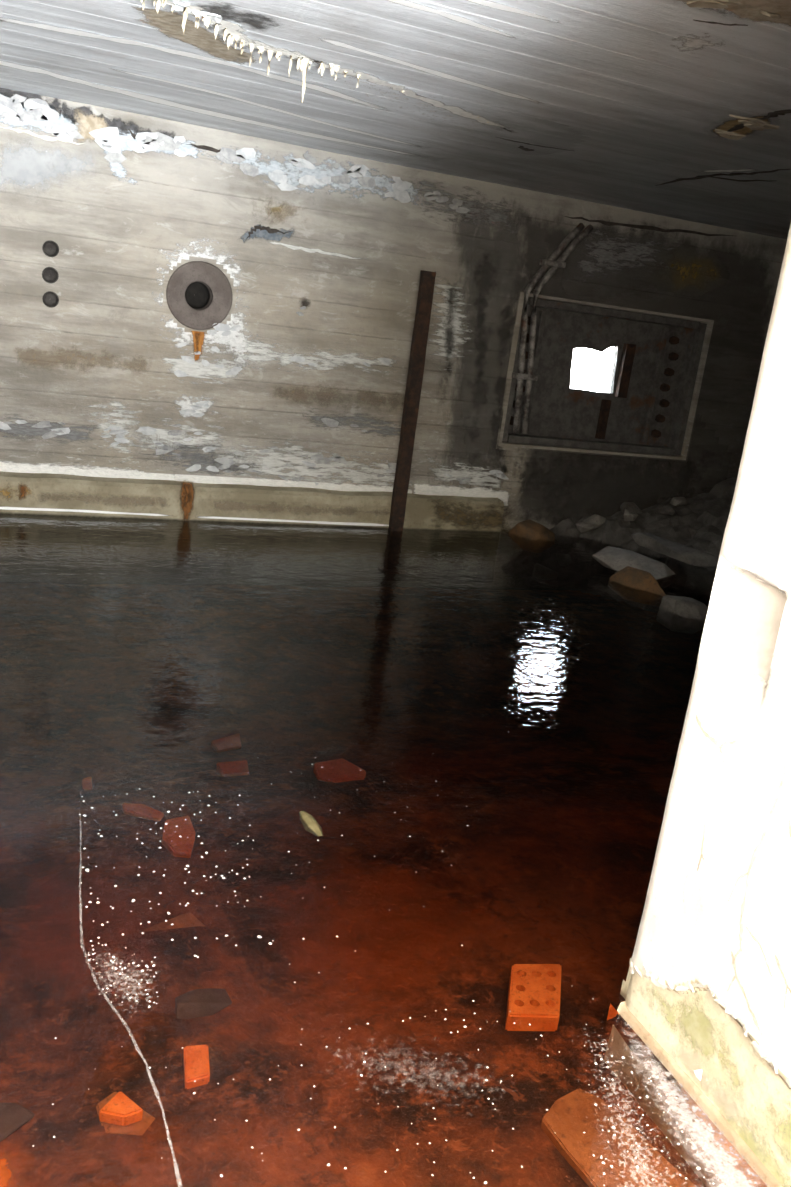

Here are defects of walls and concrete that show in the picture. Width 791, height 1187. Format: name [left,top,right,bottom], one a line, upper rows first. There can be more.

peeling [678,0,791,27]
peeling [0,94,202,184]
peeling [216,147,516,234]
rust [192,331,205,361]
rust [180,482,195,520]
peeling [620,957,791,1187]